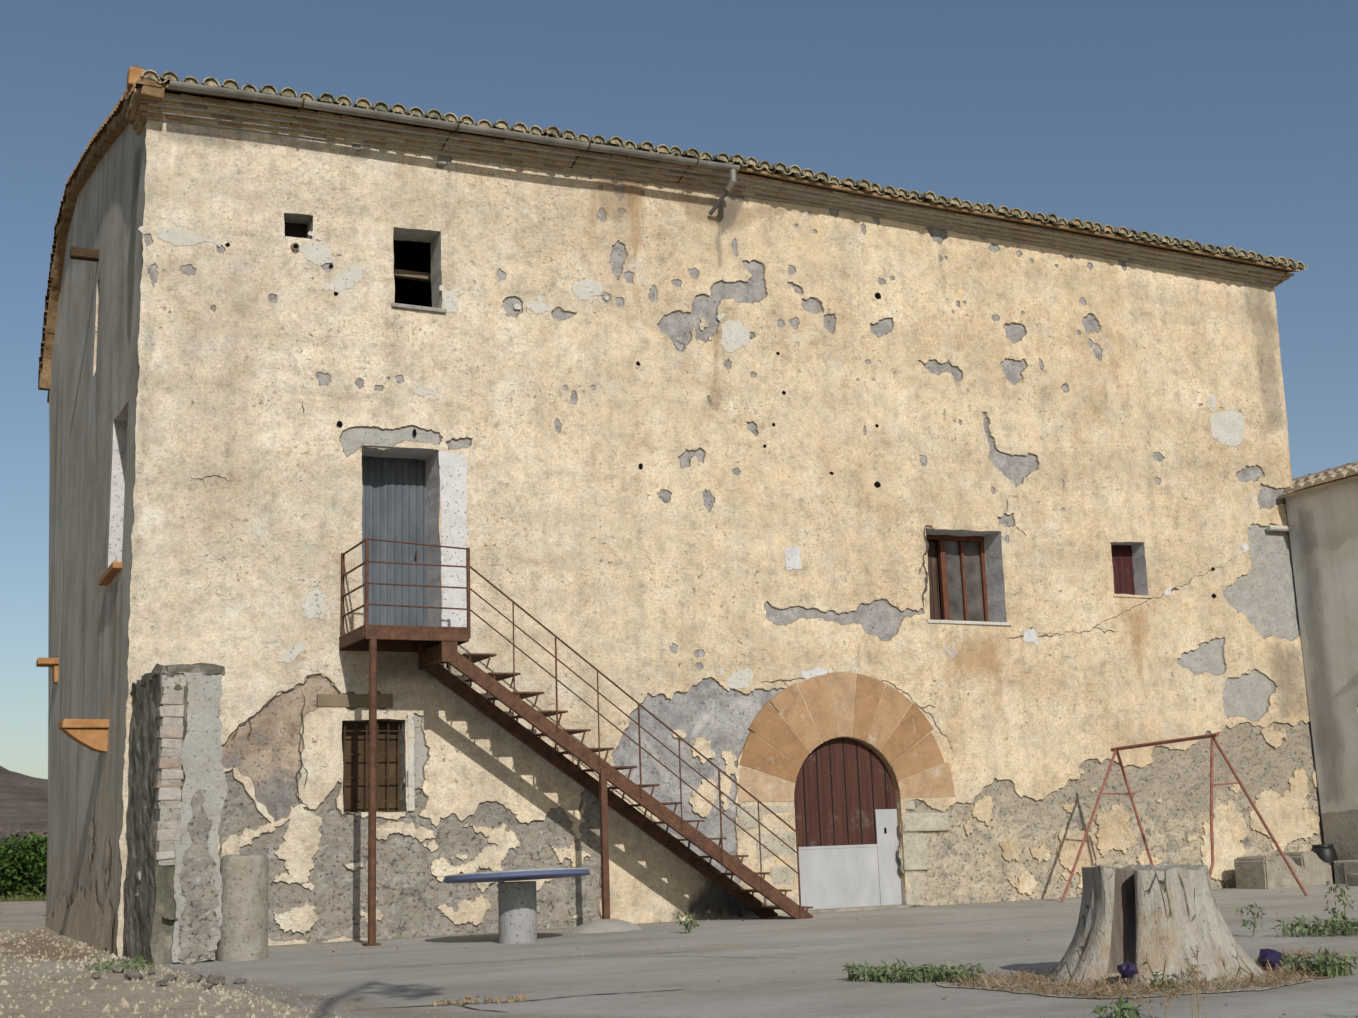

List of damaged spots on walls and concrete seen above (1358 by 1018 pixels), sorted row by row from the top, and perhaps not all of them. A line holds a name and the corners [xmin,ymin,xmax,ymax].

flaking render [609,241,634,284]
flaking render [648,285,657,303]
flaking render [657,239,766,352]
flaking render [337,421,471,457]
flaking render [983,413,1037,486]
flaking render [764,600,922,641]
crack [919,525,934,606]
crack [1009,555,1239,639]
flaking render [1212,466,1299,640]
flaking render [178,675,601,963]
flaking render [612,650,784,883]
flaking render [823,638,1324,919]